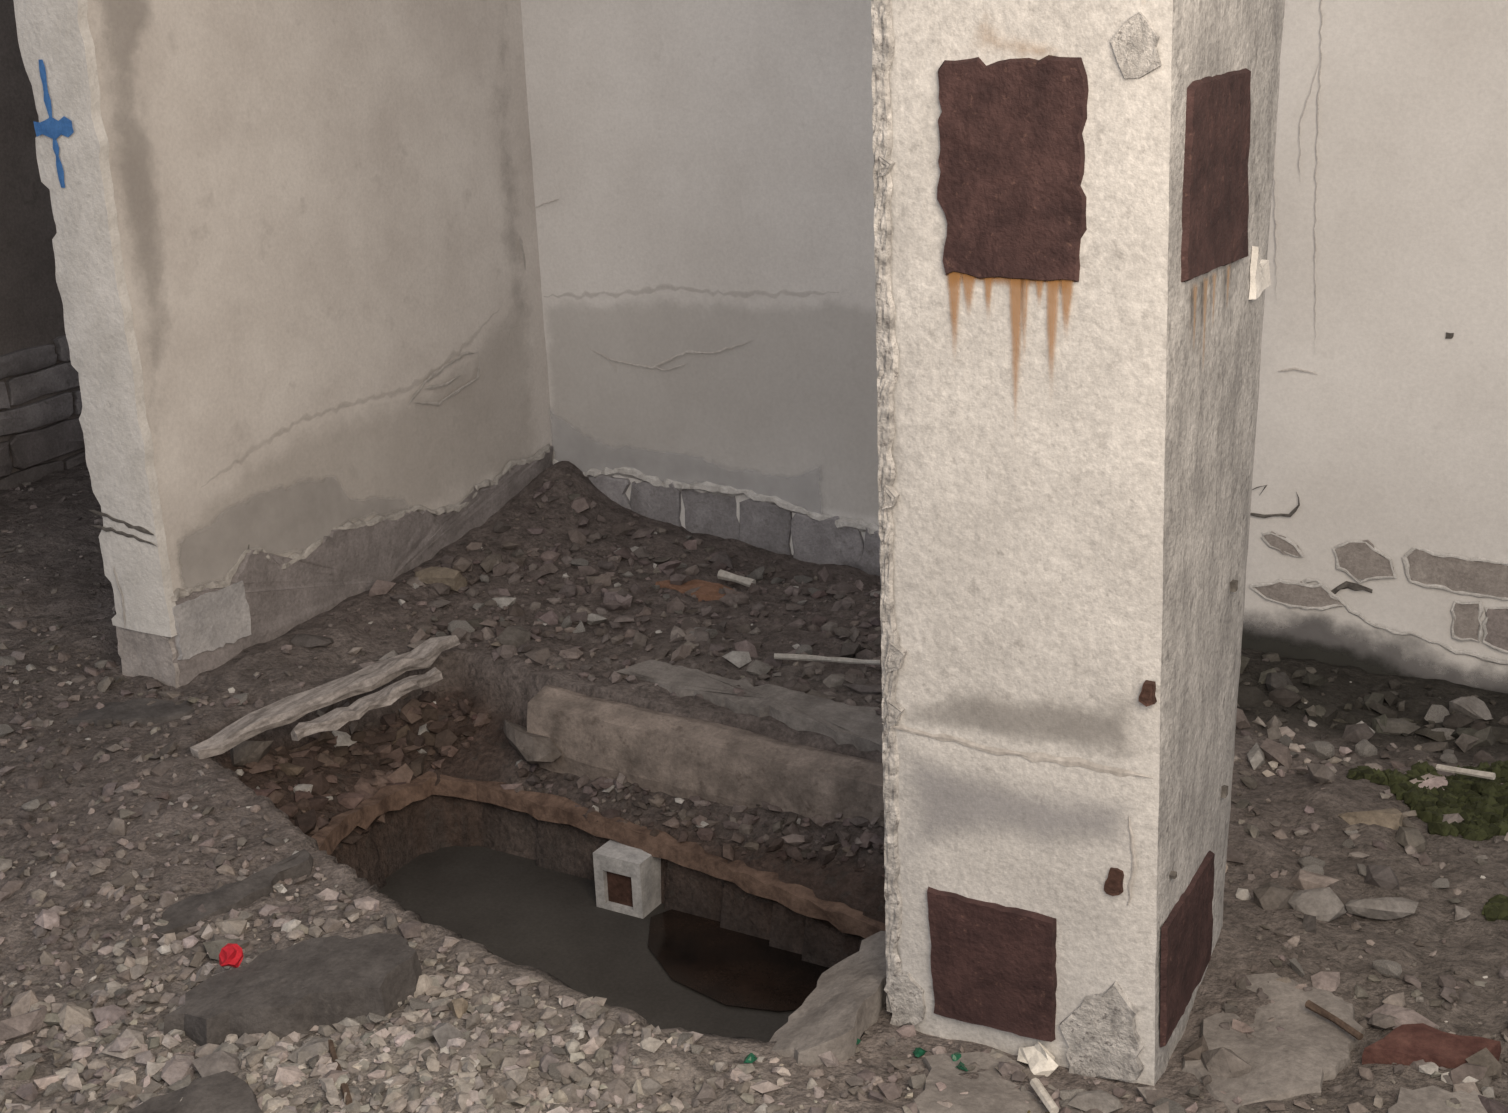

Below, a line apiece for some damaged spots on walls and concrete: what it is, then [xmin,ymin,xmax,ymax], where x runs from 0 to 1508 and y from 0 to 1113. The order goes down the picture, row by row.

crack [407,351,480,407]
rust [949,272,1072,388]
spalling [171,443,559,686]
spalling [1261,531,1304,557]
spalling [1230,540,1508,665]